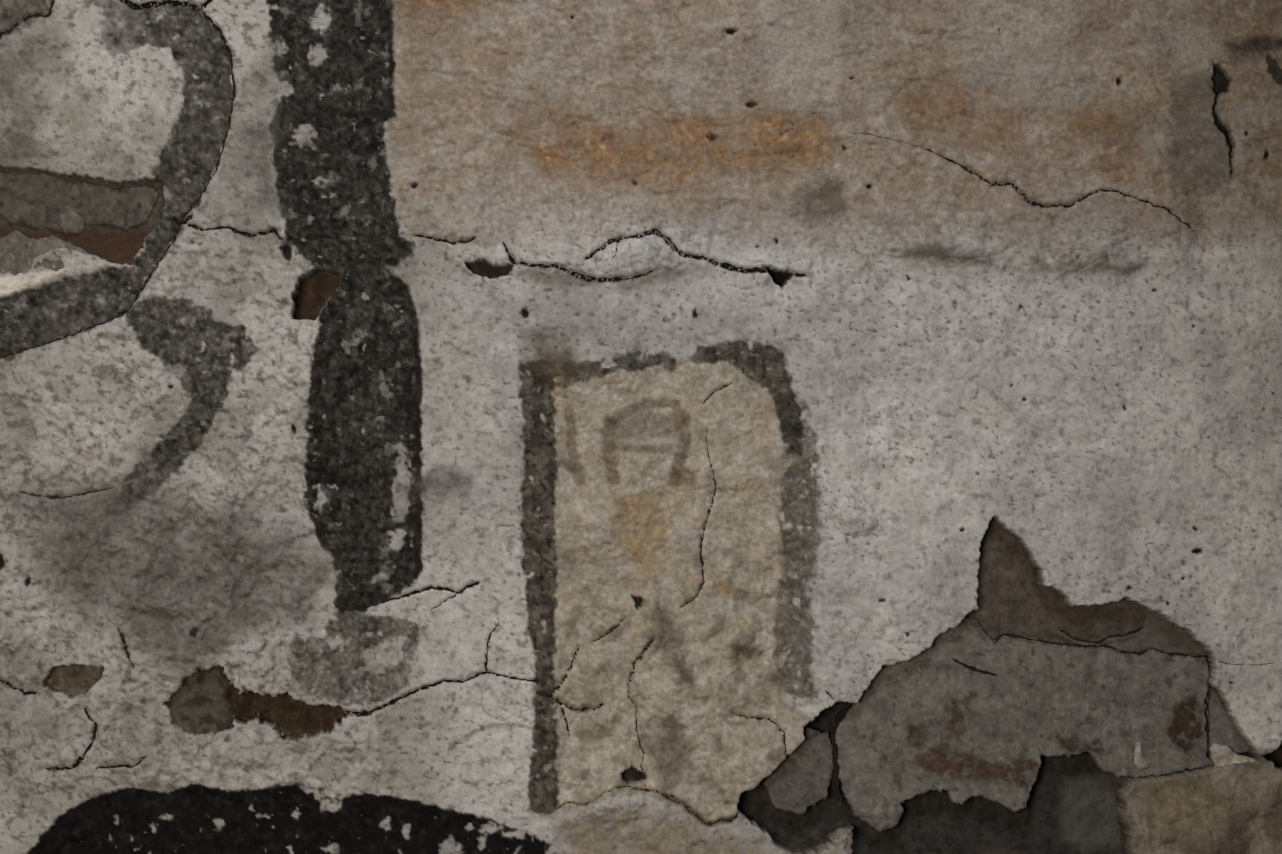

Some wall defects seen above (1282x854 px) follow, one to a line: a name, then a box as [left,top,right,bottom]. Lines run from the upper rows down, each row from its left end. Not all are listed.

flaking render [0,167,164,276]
crack [0,0,283,358]
crack [414,229,806,282]
crack [849,132,1195,231]
crack [679,382,734,609]
crack [342,582,480,611]
flaking render [164,666,346,740]
crack [345,617,739,826]
crack [731,712,787,755]
flaking render [737,519,1282,854]